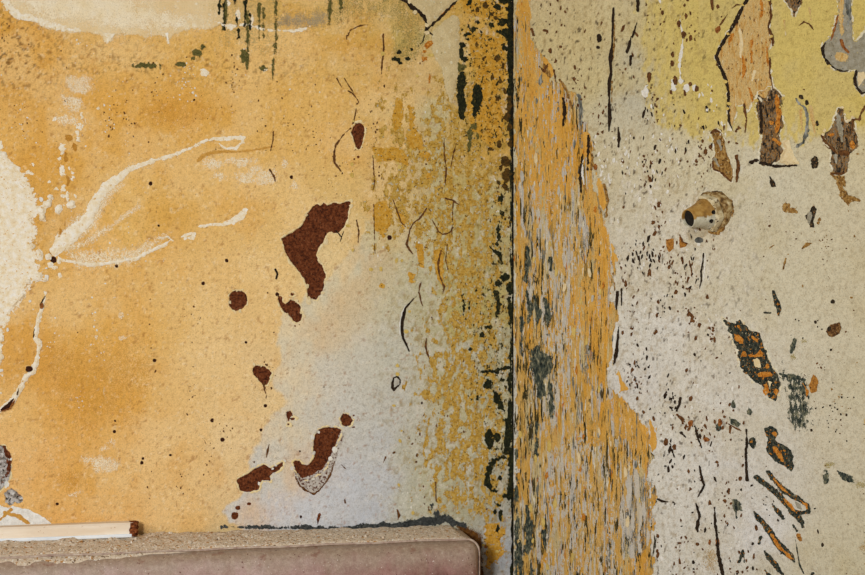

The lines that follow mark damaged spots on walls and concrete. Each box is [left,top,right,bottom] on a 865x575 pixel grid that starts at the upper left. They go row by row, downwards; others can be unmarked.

leakage [0,0,430,79]
peeling [267,0,865,575]
leakage [19,312,167,497]
spalling [0,444,23,506]
spalling [231,413,355,520]